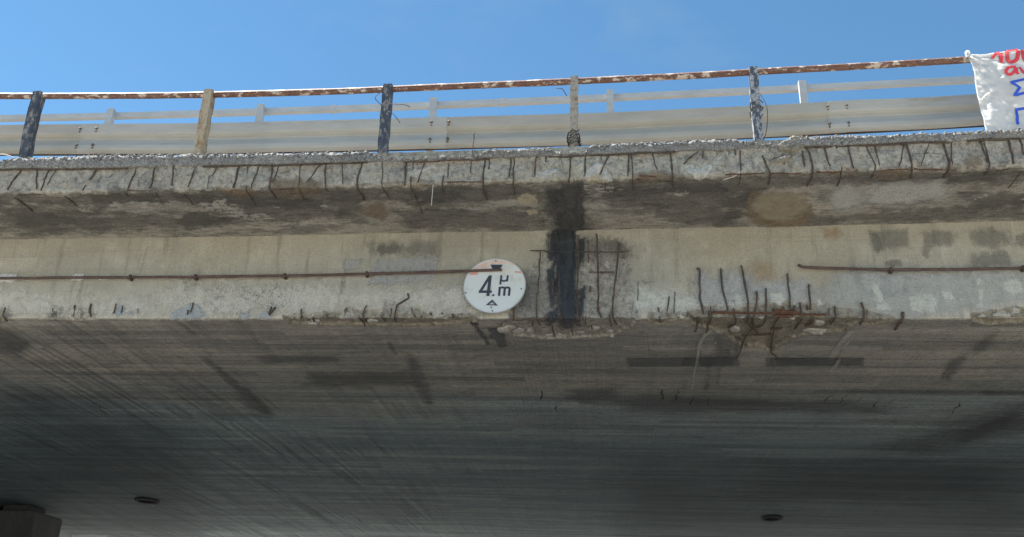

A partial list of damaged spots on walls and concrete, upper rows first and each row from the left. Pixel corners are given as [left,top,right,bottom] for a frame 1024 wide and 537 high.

spalling [0,128,1024,221]
water stain [828,179,952,212]
peeling [0,257,483,327]
water stain [516,162,624,330]
spalling [497,233,1024,359]